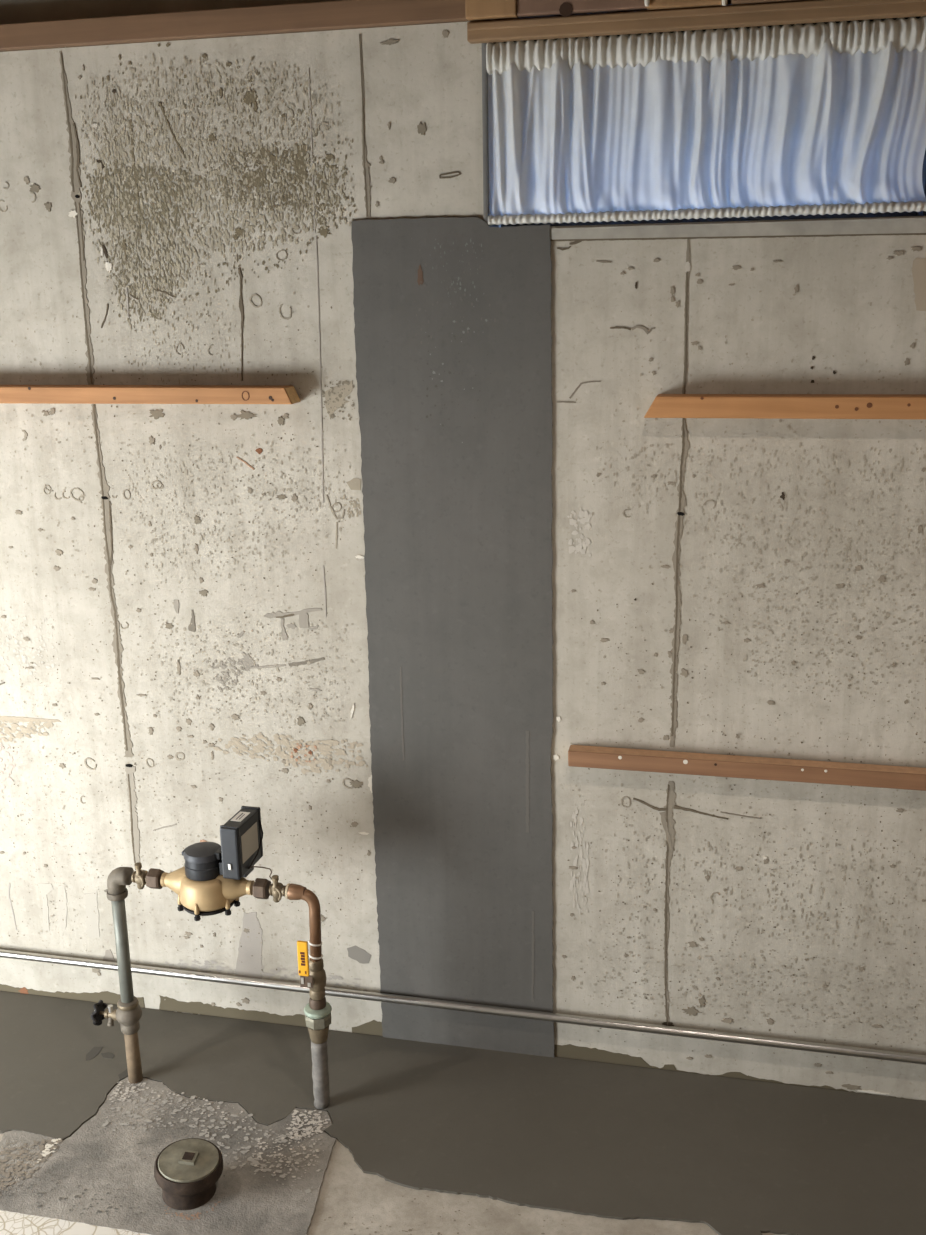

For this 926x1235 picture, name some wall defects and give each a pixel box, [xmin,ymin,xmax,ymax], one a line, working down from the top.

crack [61,53,176,870]
water stain [68,54,357,385]
crack [557,381,601,403]
crack [610,325,655,334]
crack [671,271,688,736]
crack [550,233,926,263]